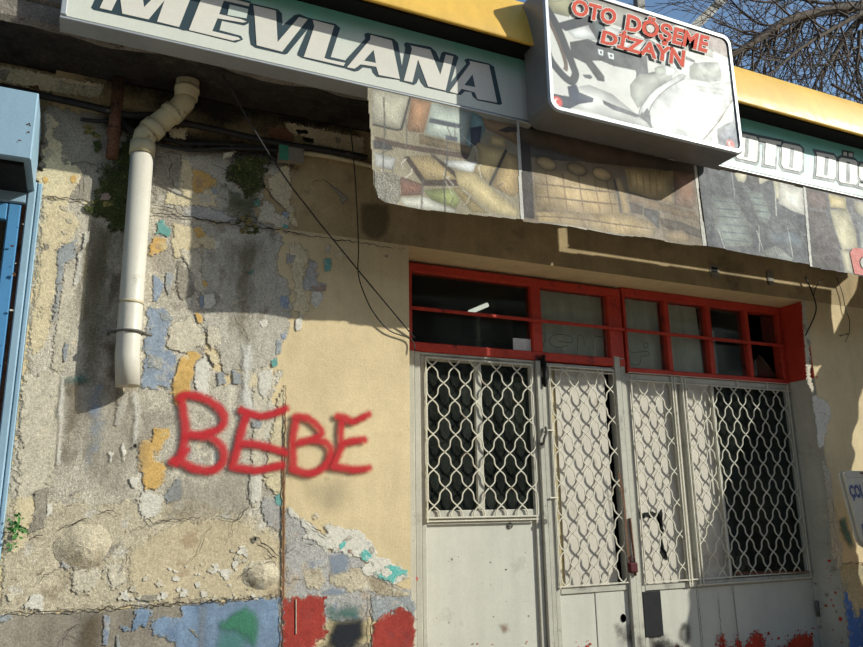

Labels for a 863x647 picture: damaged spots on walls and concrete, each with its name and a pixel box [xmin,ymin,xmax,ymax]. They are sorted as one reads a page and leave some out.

peeling [0,65,104,98]
crack [152,153,406,250]
flaking render [0,106,412,647]
peeling [800,300,818,393]
crack [33,388,328,577]
crack [1,595,283,647]
peeling [715,559,863,647]